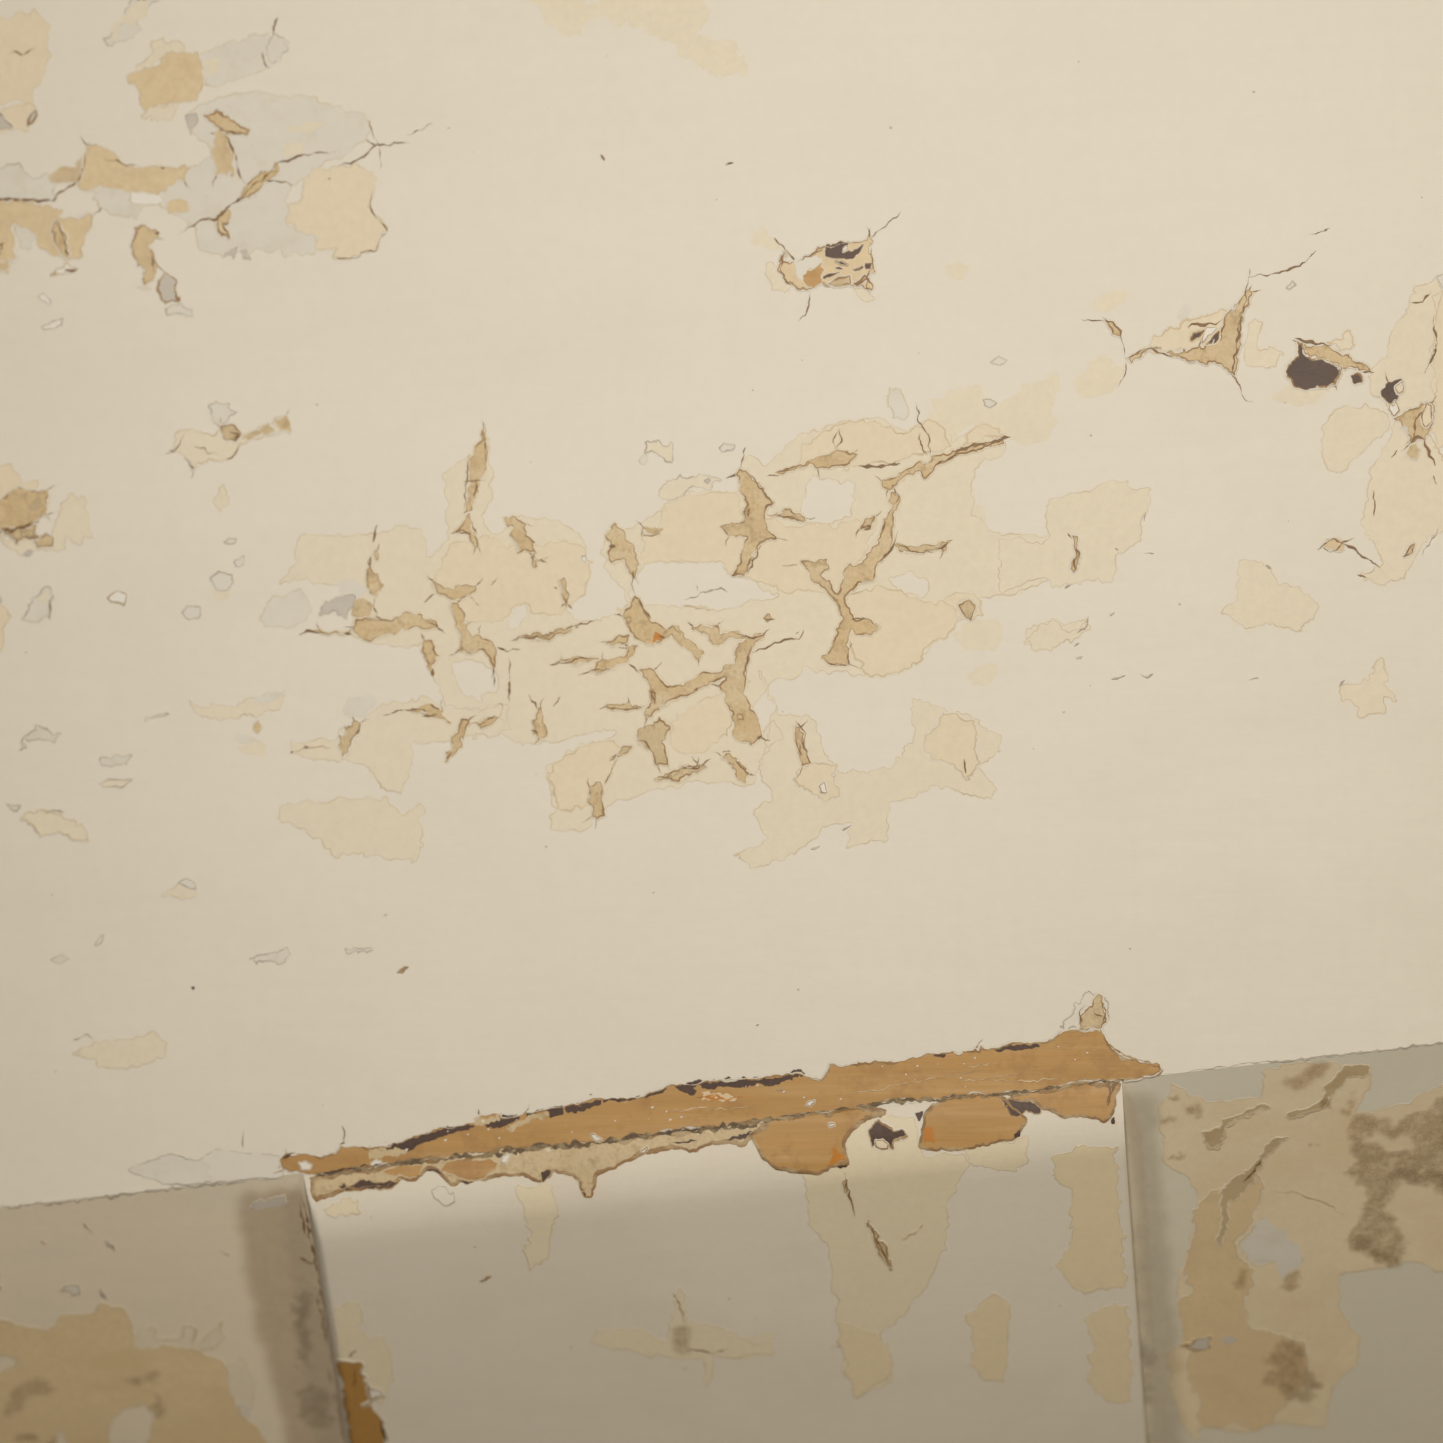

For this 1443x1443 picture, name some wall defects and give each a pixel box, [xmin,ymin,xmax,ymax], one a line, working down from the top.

peeling [0,0,388,318]
peeling [750,214,899,319]
flaking render [0,463,94,558]
peeling [166,400,293,478]
peeling [1148,273,1443,586]
peeling [0,584,55,652]
peeling [278,373,1152,869]
peeling [128,990,1443,1443]
peeling [0,1283,269,1443]